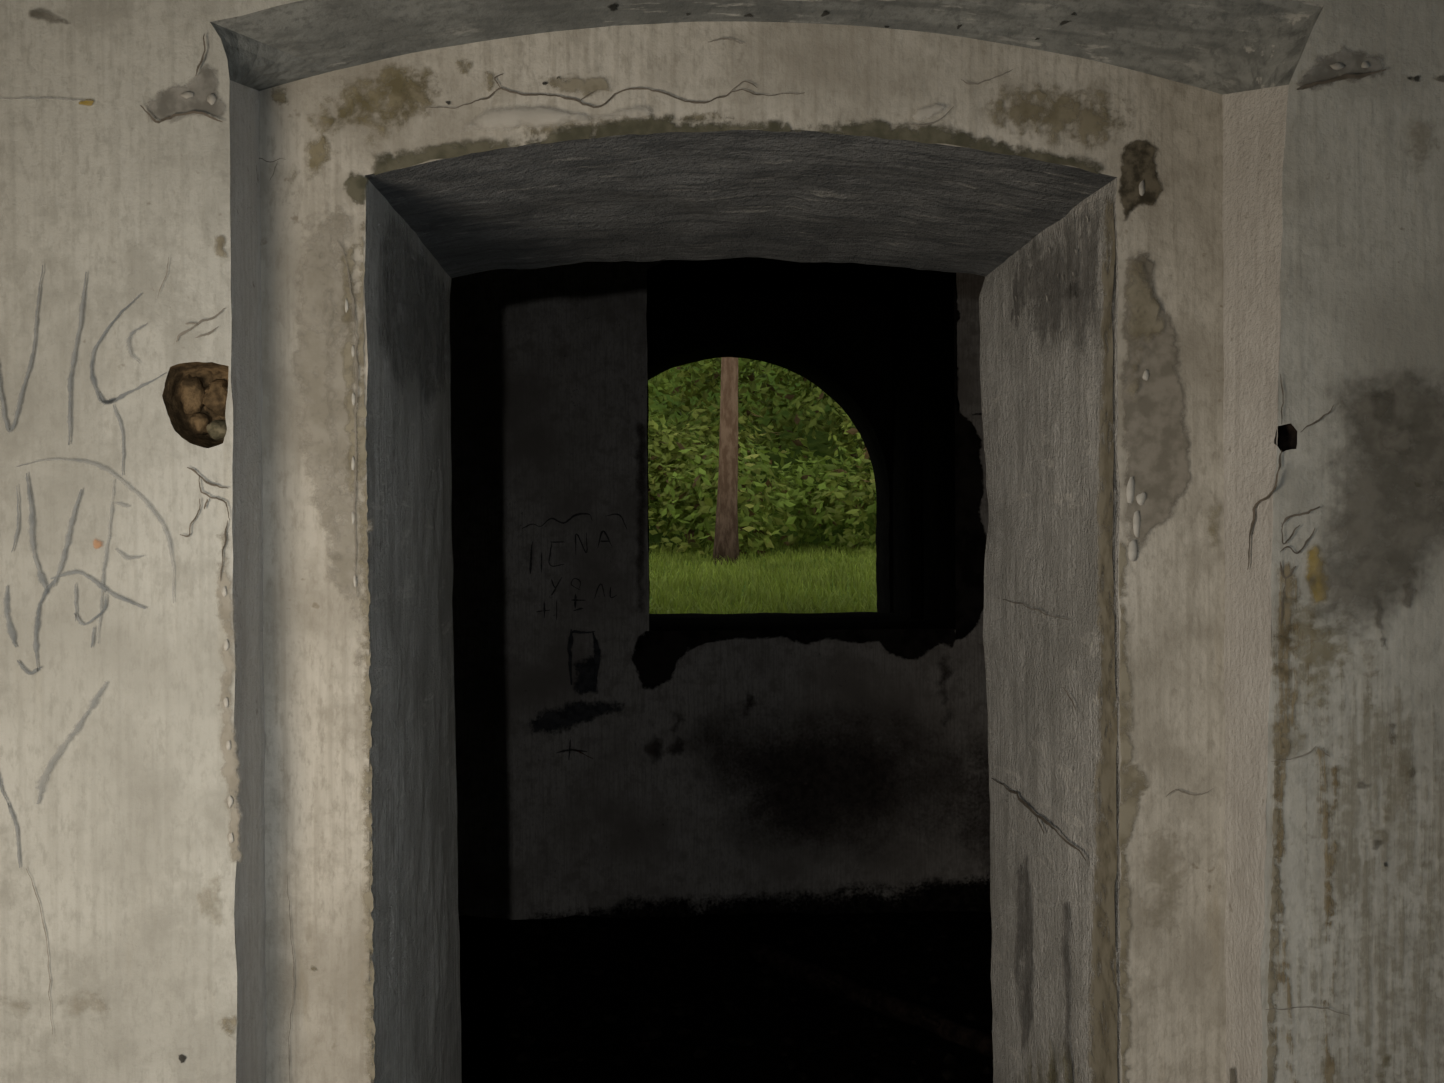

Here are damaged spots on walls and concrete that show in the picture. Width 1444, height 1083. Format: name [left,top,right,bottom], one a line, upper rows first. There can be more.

flaking render [140,34,225,123]
flaking render [542,76,609,96]
crack [428,74,803,109]
flaking render [1297,47,1386,90]
flaking render [1118,140,1163,219]
spalling [162,362,233,448]
flaking render [1120,254,1190,562]
flaking render [632,286,987,689]
crack [1247,375,1334,626]
damp [1283,373,1444,705]
crack [992,778,1086,861]